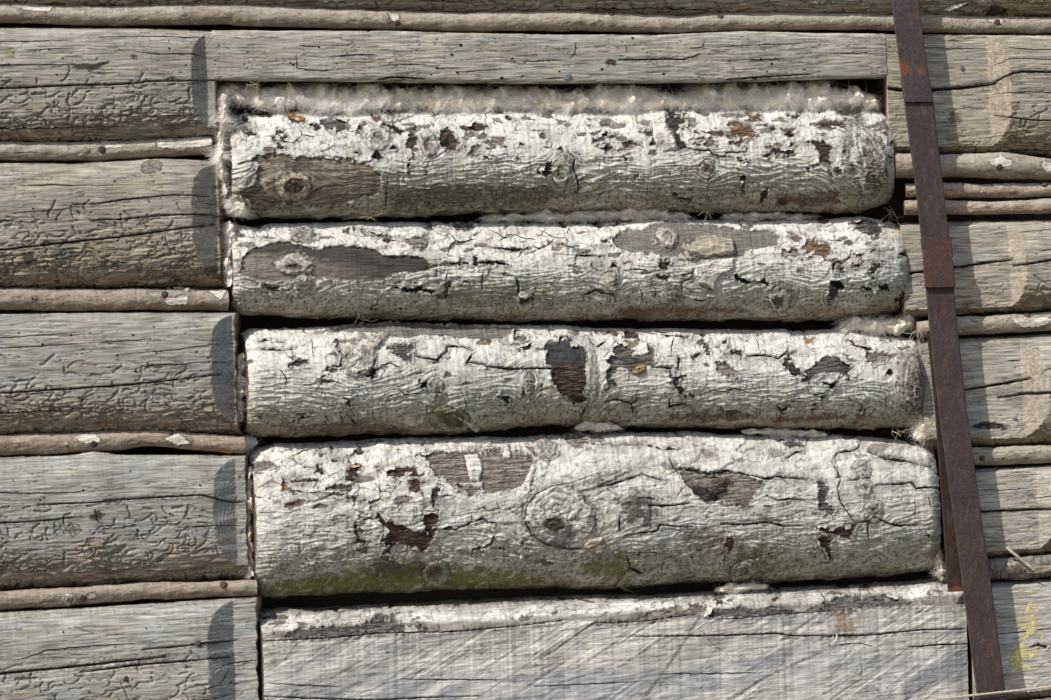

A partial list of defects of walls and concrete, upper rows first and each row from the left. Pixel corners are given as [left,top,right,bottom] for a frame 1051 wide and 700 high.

crack [925,47,1051,121]
peeling [239,110,418,214]
peeling [587,107,863,192]
peeling [238,226,452,299]
peeling [601,218,904,305]
peeling [316,308,531,386]
peeling [544,334,589,407]
peeling [595,331,657,391]
peeling [782,352,854,410]
crack [965,345,1051,398]
peeling [281,379,536,554]
crack [670,669,762,677]